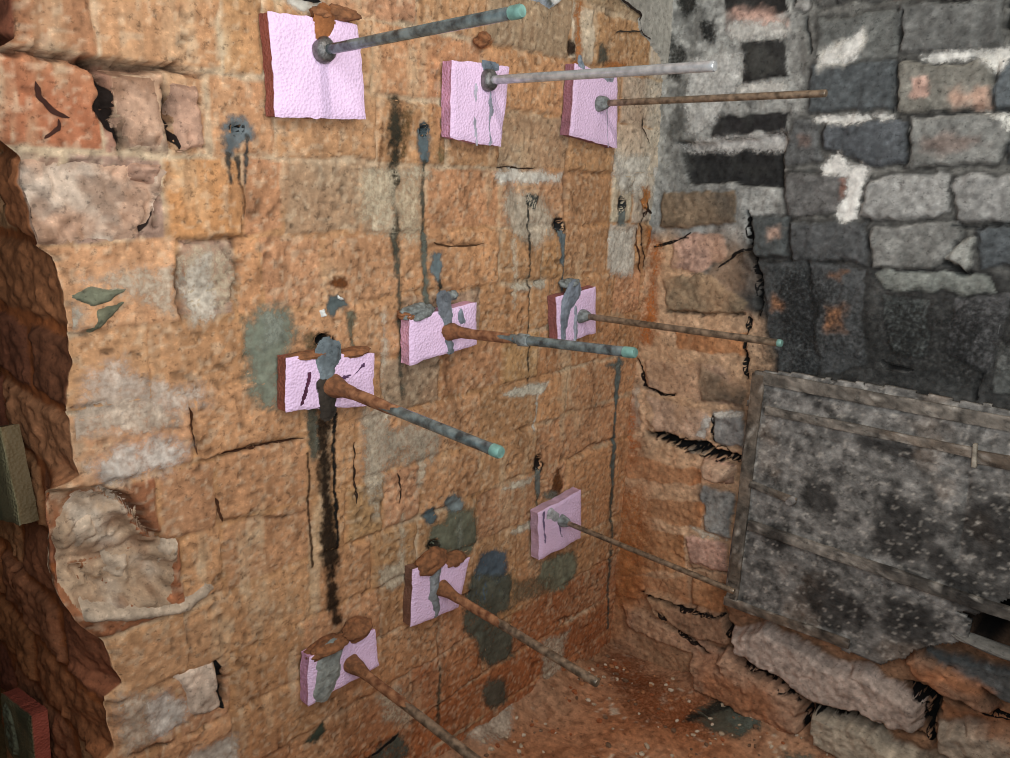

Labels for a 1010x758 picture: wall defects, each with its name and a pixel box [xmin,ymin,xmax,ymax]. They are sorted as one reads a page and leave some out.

peeling [531,0,561,9]
peeling [621,0,673,81]
spalling [93,70,204,152]
spalling [18,155,167,249]
crack [638,358,675,396]
crack [652,415,742,463]
spalling [47,485,214,623]
leakage [306,408,342,625]